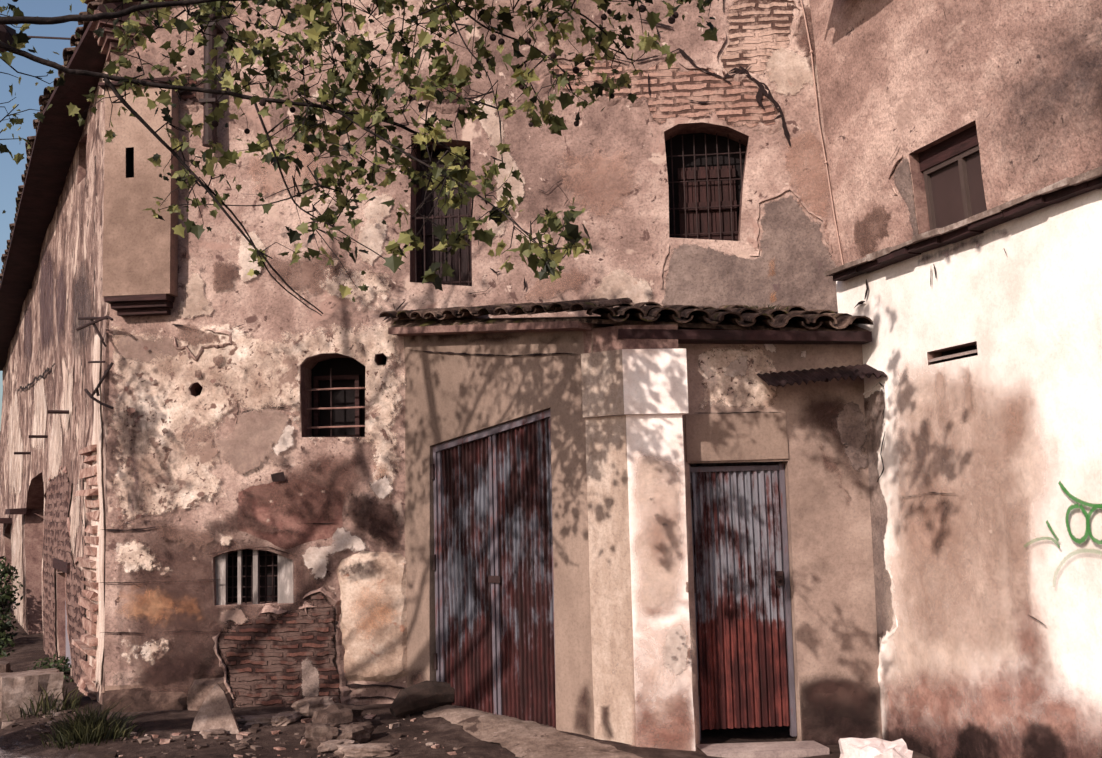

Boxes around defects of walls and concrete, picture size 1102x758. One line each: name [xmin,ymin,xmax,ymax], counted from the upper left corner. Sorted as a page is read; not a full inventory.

flaking render [542,0,804,135]
crack [636,19,791,146]
flaking render [173,325,233,384]
flaking render [215,409,289,482]
flaking render [863,383,890,458]
flaking render [42,465,86,684]
peeling [156,524,225,560]
damp [115,454,400,706]
damp [799,372,1102,758]
flaking render [212,586,350,708]